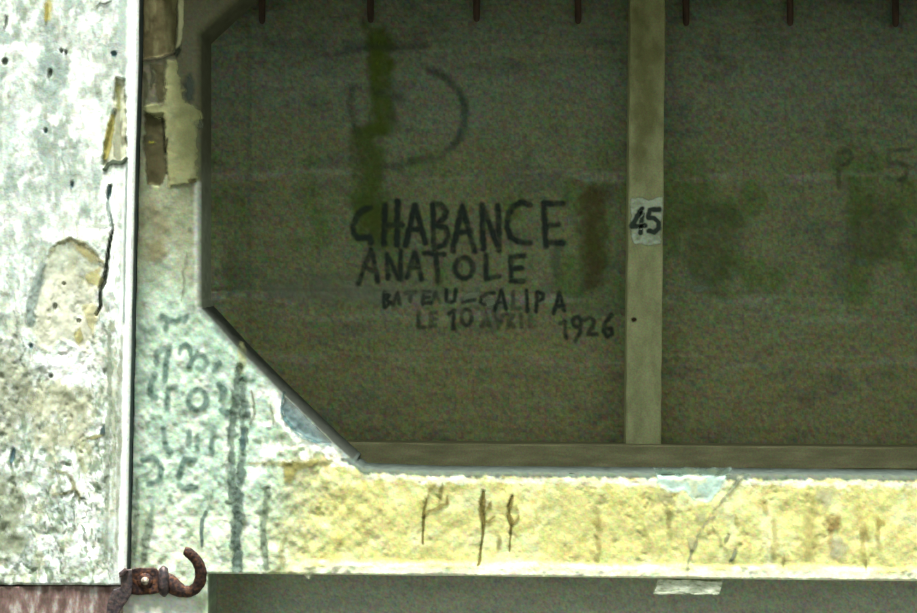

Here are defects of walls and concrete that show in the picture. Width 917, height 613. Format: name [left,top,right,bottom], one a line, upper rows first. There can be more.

peeling [142,0,184,186]
peeling [26,237,103,352]
crack [87,165,127,323]
spalling [656,468,731,504]
crack [687,476,747,569]